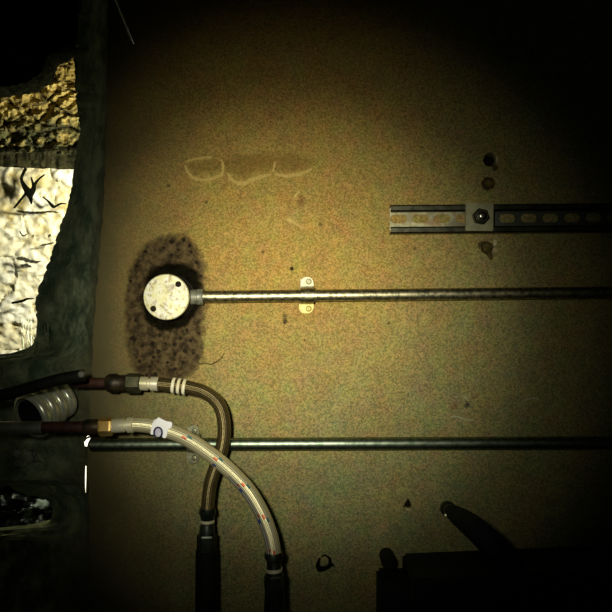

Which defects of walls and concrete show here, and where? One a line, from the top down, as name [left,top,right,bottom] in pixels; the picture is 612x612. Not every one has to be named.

damp [184,156,312,186]
crack [17,208,59,216]
crack [16,256,41,268]